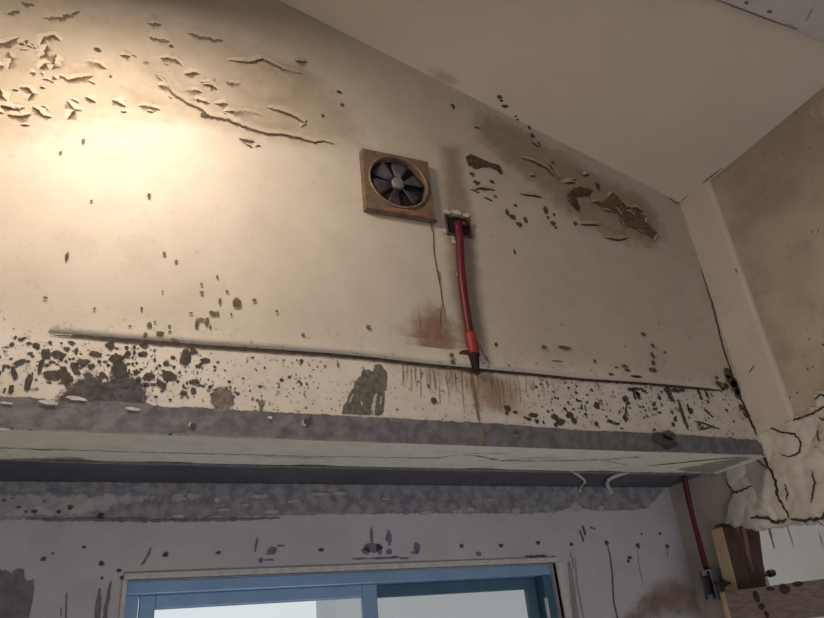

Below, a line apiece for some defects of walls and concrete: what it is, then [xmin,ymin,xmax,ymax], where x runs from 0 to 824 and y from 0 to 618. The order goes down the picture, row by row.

peeling [42,4,80,21]
peeling [0,31,112,127]
peeling [112,98,127,113]
peeling [119,12,335,148]
flaking render [466,154,503,202]
peeling [474,121,658,242]
leakage [189,290,242,329]
leakage [0,321,278,404]
crack [0,223,824,524]
rust [402,311,546,421]
leakage [514,344,748,431]
leakage [0,568,34,618]